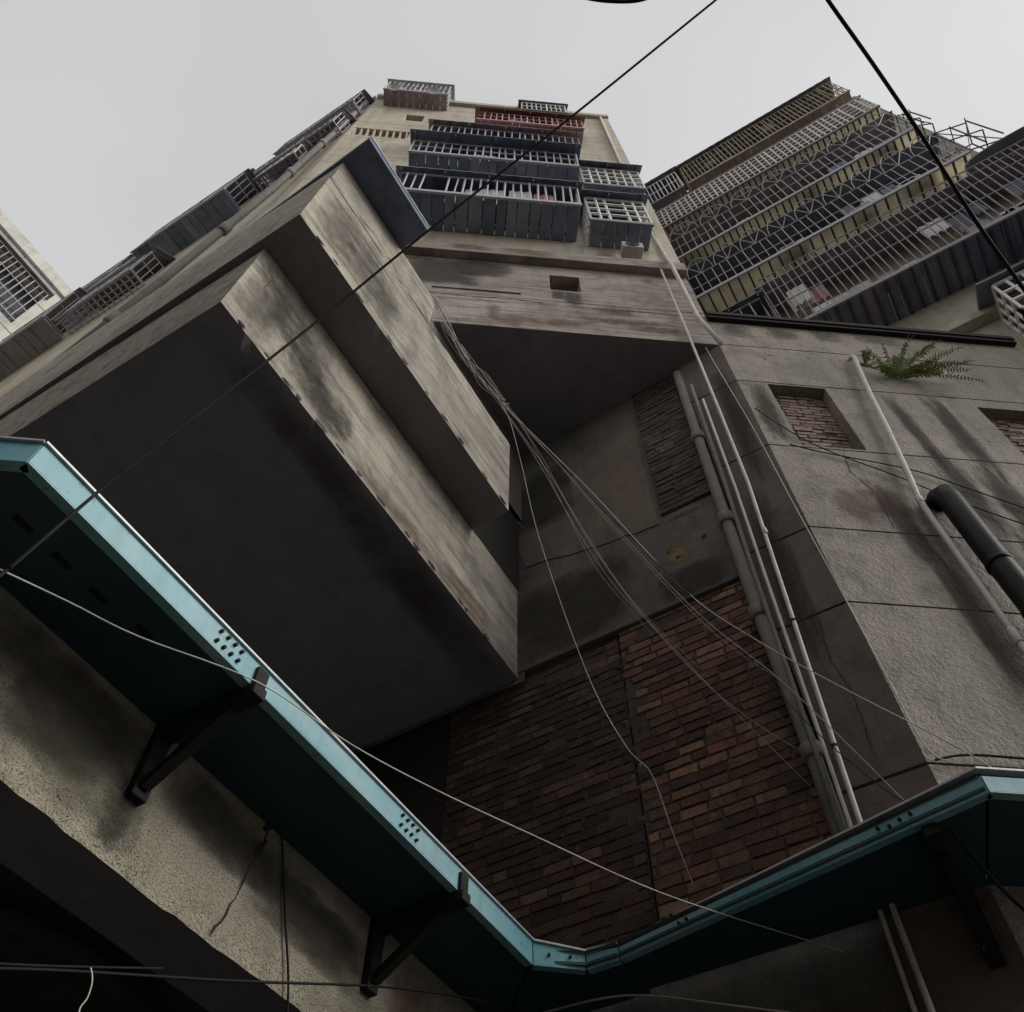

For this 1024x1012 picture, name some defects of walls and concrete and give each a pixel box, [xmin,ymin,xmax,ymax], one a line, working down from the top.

crack [818,621,877,762]